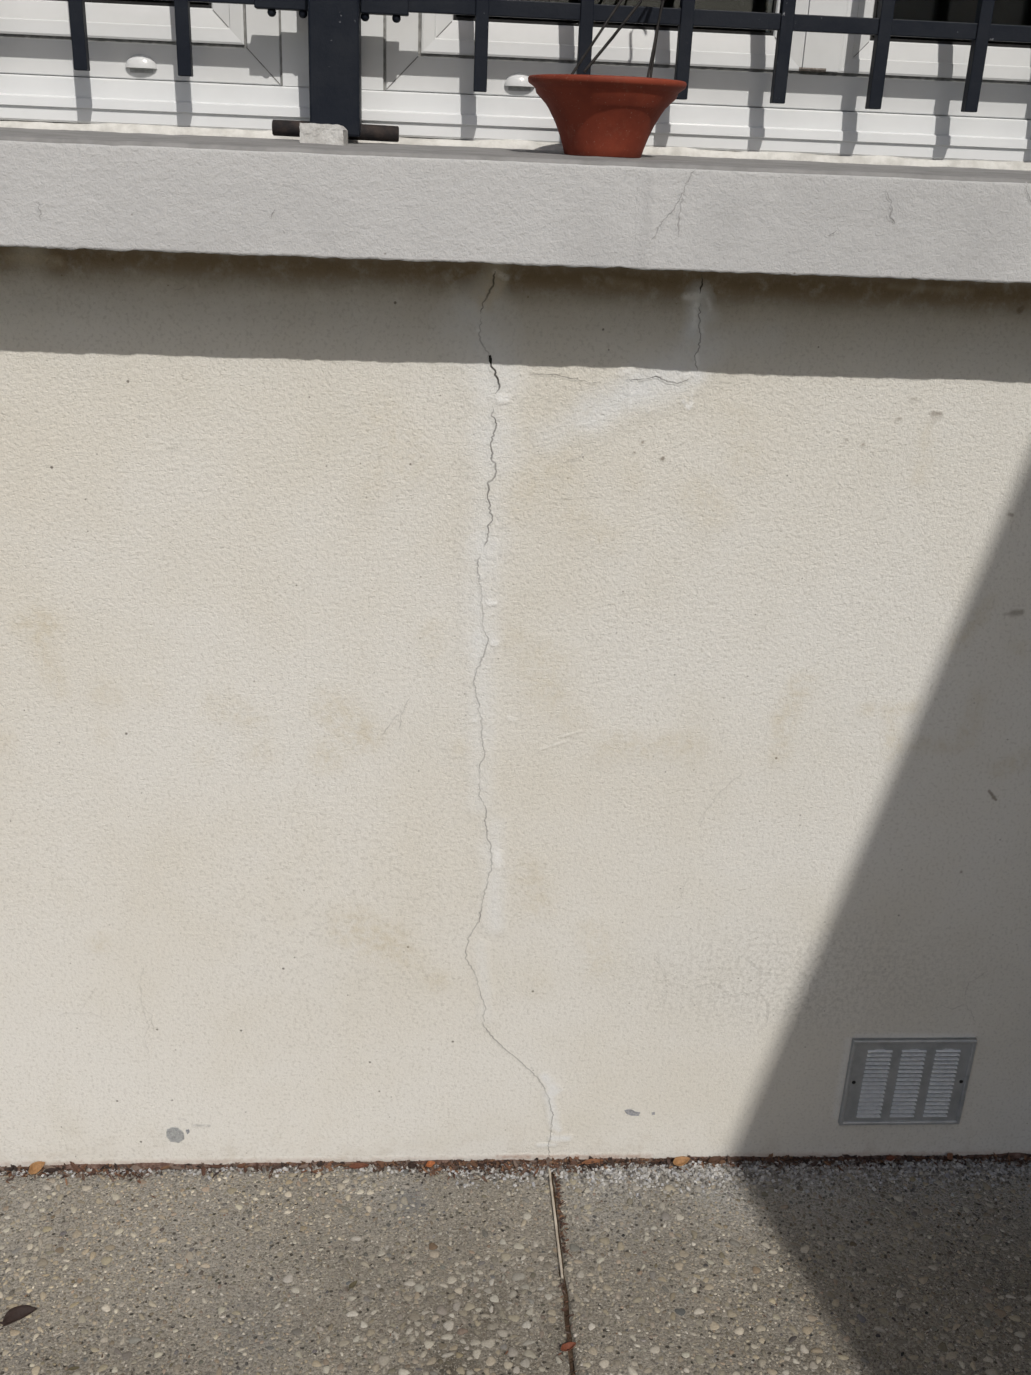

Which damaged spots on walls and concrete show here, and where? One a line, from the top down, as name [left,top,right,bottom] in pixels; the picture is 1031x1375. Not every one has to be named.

crack [424,263,786,1158]